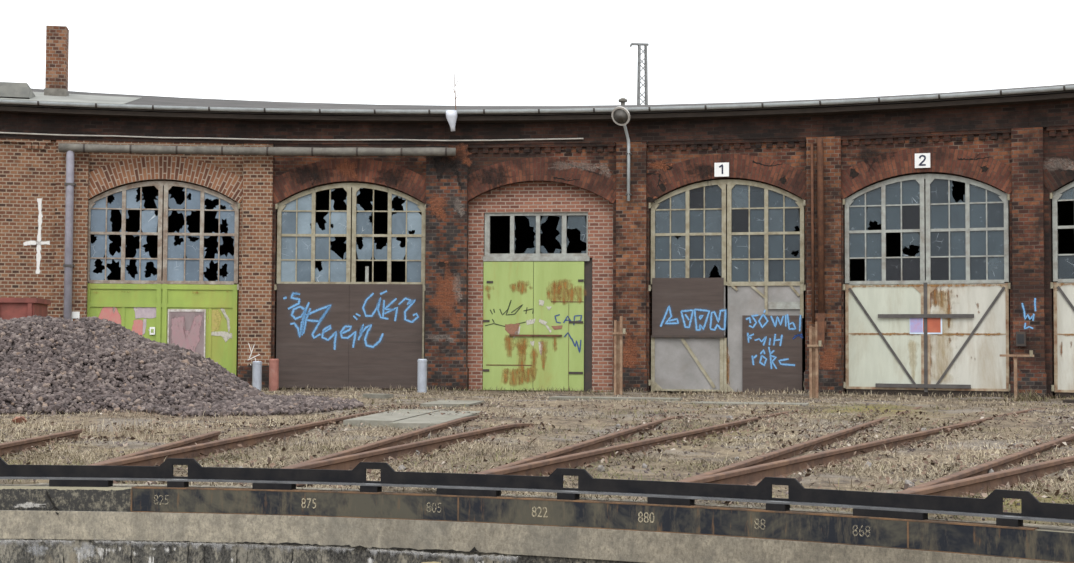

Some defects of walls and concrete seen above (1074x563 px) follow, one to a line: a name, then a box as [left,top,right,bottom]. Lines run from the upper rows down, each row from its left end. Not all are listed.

rust [547,281,582,303]
rust [504,336,556,385]
damp [368,548,518,563]